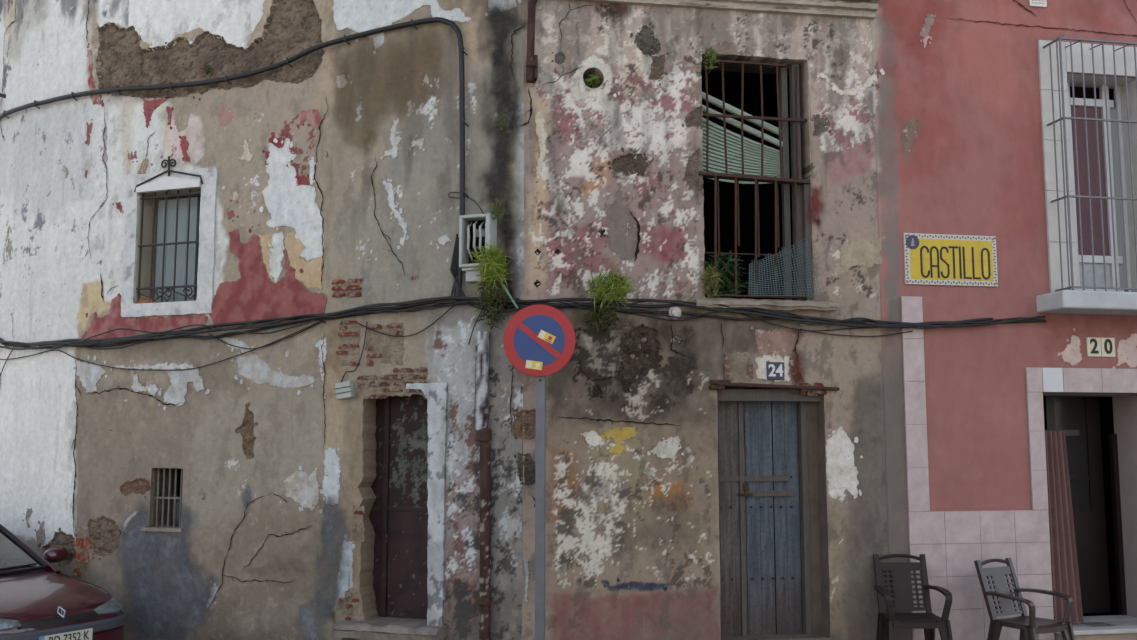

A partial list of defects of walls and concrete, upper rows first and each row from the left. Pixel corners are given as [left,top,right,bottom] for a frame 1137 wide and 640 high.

crack [85,113,116,302]
peeling [81,109,428,400]
flaking render [87,0,471,162]
crack [371,152,405,277]
leakage [485,7,525,312]
peeling [535,54,620,179]
flaking render [607,148,651,176]
flaking render [630,22,697,86]
peeling [73,355,210,410]
peeling [825,426,863,499]
leakage [120,507,213,640]
crack [208,493,309,608]